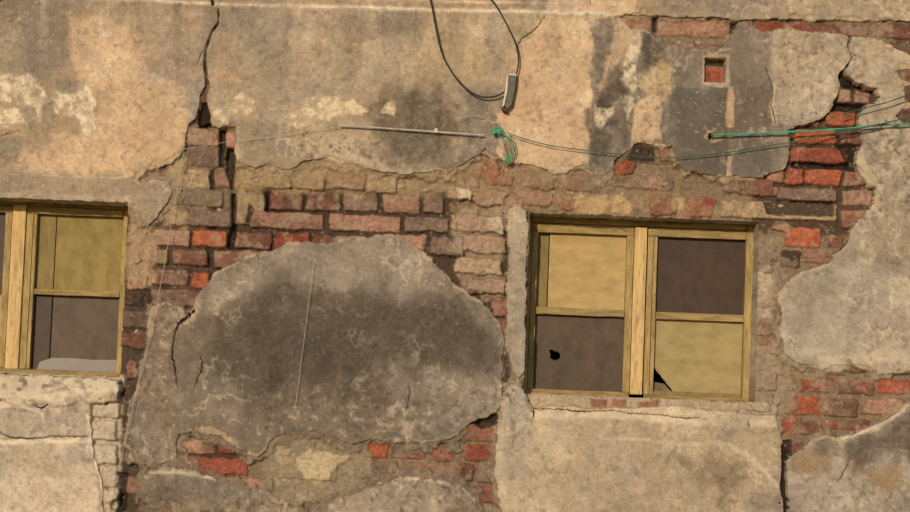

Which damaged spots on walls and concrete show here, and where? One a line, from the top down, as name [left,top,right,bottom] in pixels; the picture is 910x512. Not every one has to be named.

efflorescence [0,74,100,140]
crack [200,104,211,126]
water stain [594,31,658,147]
flaking render [0,8,525,512]
flaking render [457,14,910,461]
crack [171,309,203,387]
crack [778,446,788,512]